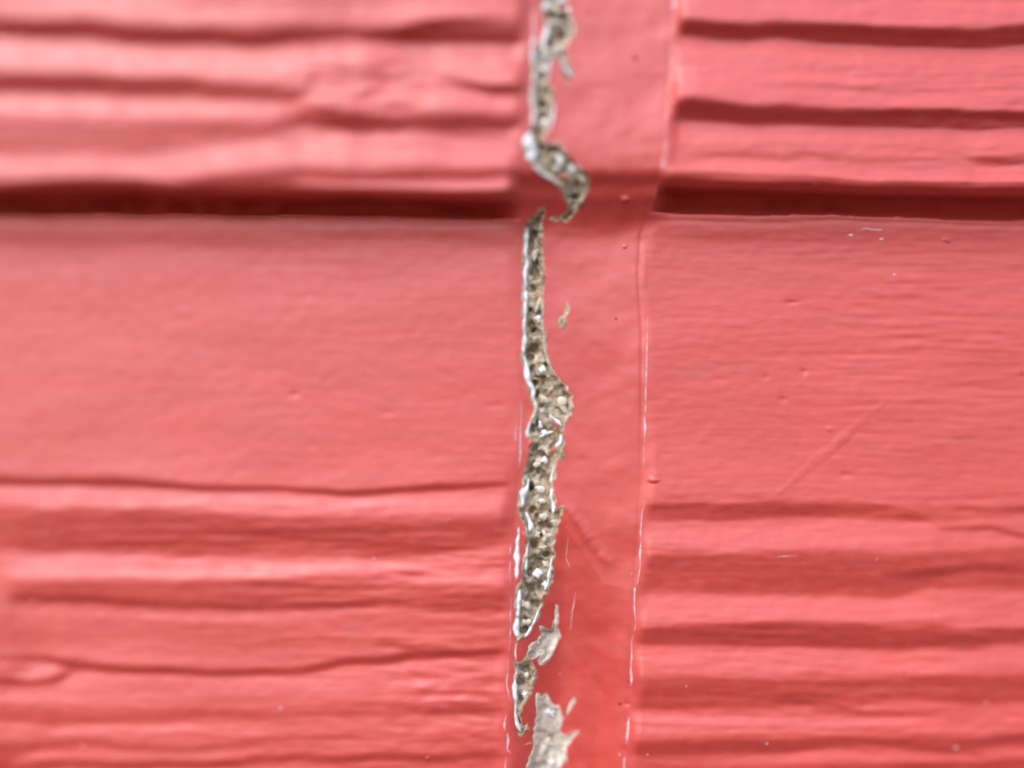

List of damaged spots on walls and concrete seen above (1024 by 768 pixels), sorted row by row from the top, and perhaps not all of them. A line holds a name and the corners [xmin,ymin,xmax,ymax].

peeling [512,0,590,768]